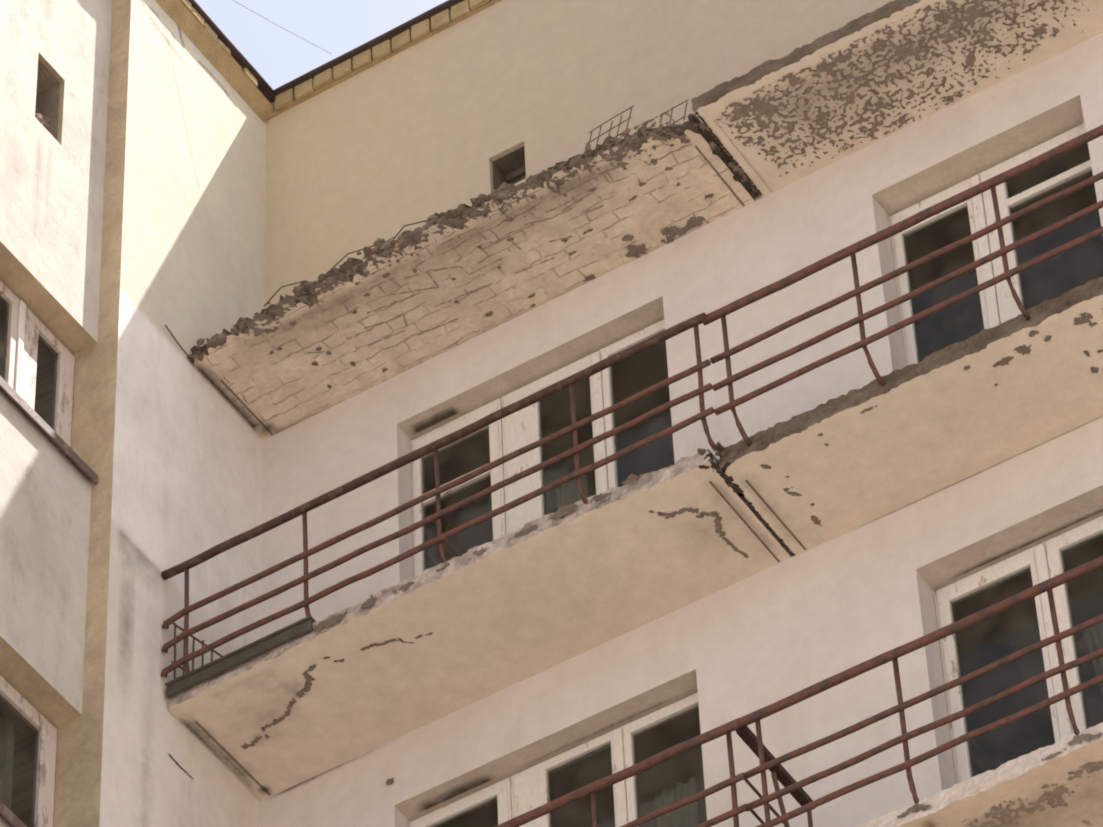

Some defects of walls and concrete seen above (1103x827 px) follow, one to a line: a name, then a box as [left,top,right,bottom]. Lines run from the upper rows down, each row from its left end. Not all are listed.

peeling [716,0,1089,177]
spalling [165,99,691,362]
spalling [660,216,709,244]
spalling [1073,308,1103,327]
spalling [993,330,1052,367]
crack [649,462,795,558]
spalling [783,476,822,527]
spalling [312,609,347,632]
crack [240,632,433,749]
spalling [1042,732,1102,761]
spalling [897,803,930,818]
peeling [962,761,1103,827]